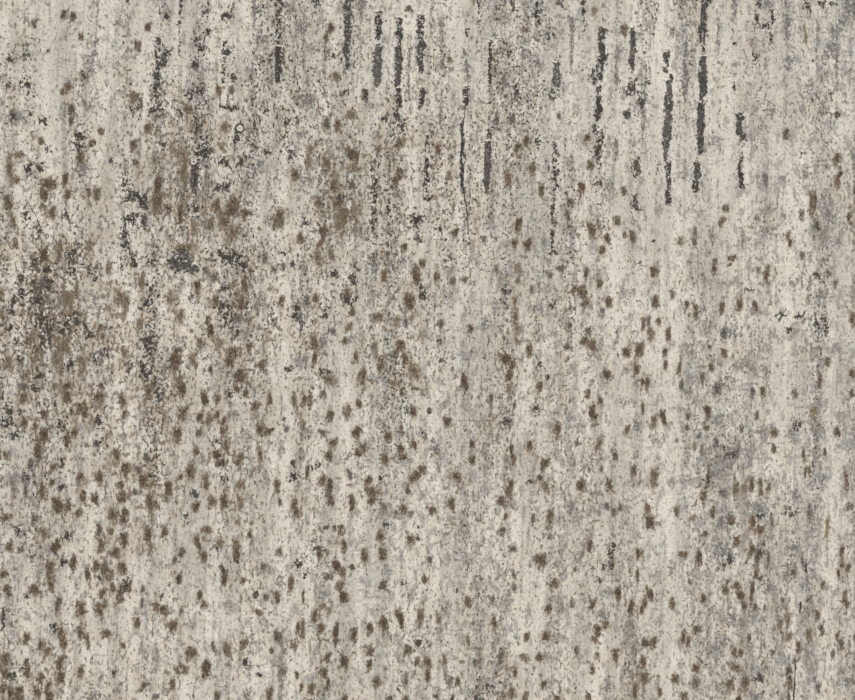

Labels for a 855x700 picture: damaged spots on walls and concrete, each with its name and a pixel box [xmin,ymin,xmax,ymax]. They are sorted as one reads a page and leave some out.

leakage [285,4,309,67]
leakage [300,25,328,112]
leakage [615,44,625,90]
leakage [680,41,691,103]
leakage [715,0,738,61]
crack [460,104,468,222]